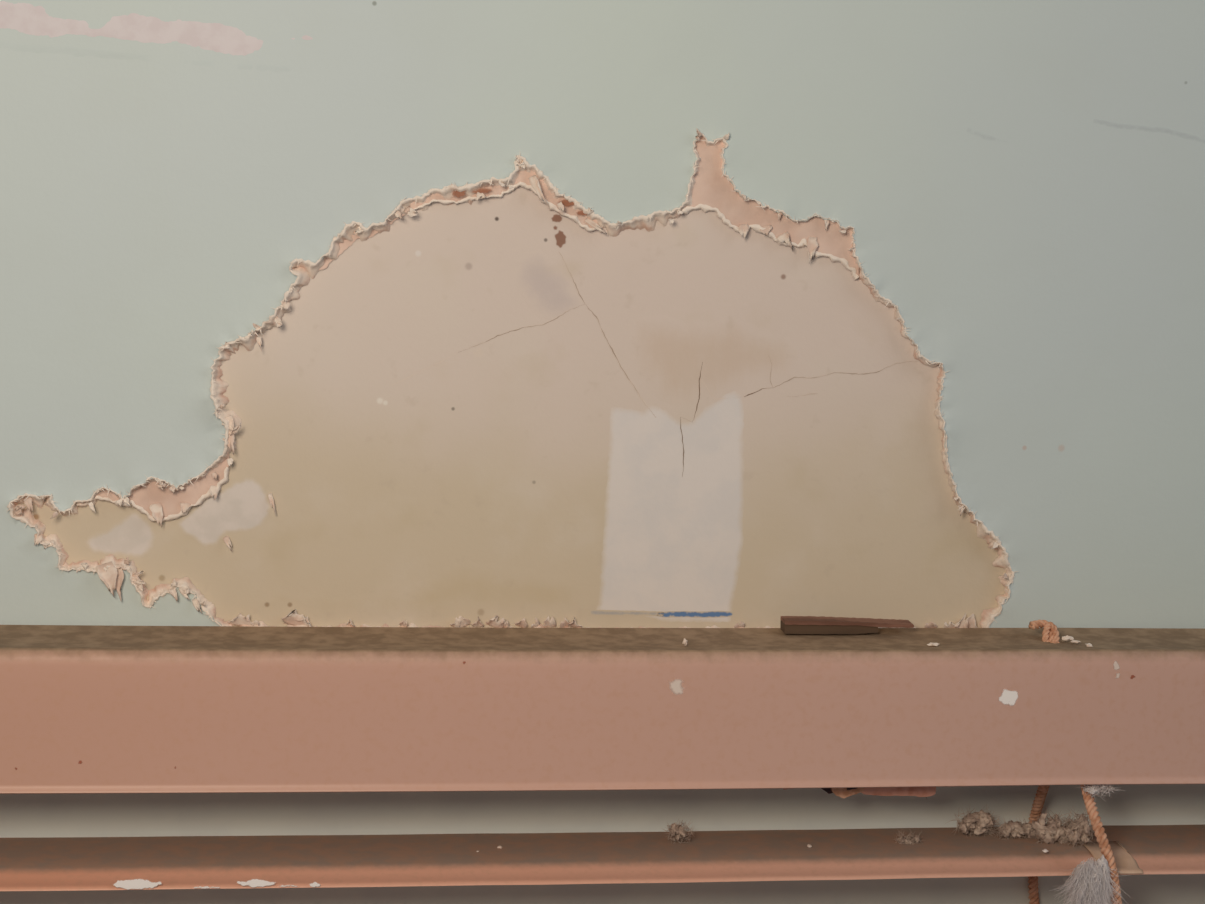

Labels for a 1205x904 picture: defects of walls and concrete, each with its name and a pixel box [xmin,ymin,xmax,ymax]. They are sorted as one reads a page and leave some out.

crack [393,252,912,475]
peeling [96,557,146,601]
peeling [228,613,260,626]
peeling [281,609,312,627]
peeling [944,613,978,628]
peeling [999,689,1018,705]
peeling [114,879,161,890]
peeling [237,879,320,887]